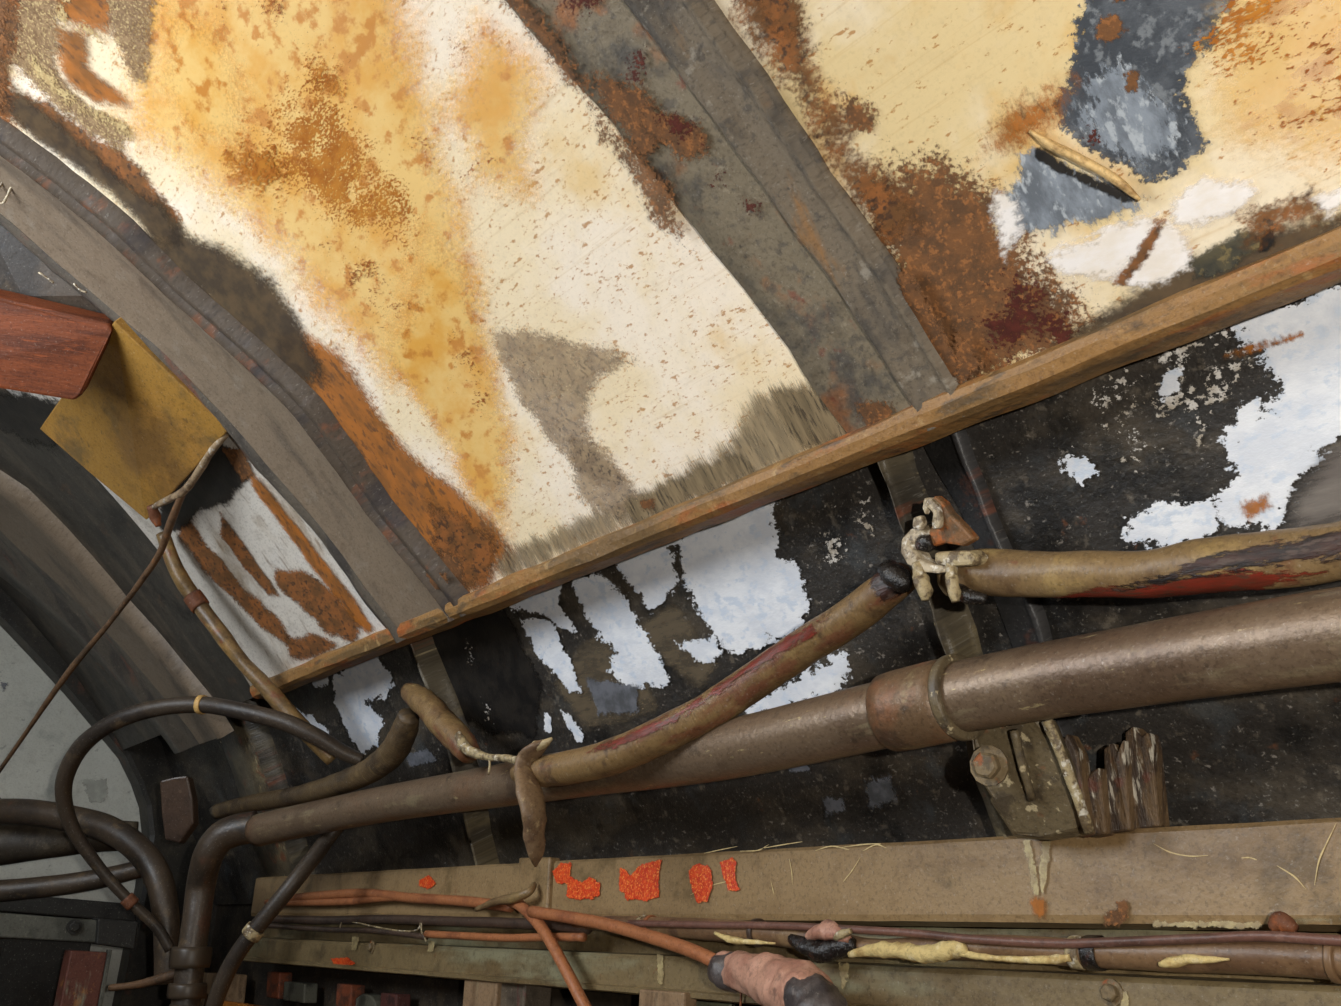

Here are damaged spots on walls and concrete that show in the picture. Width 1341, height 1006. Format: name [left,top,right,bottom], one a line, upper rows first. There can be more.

peeling [8,0,163,157]
corrosion [0,0,182,223]
corrosion [44,0,733,593]
corrosion [730,0,1101,384]
peeling [989,0,1256,287]
corrosion [178,475,373,661]
leakage [492,326,754,524]
peeling [509,498,811,716]
peeling [745,649,853,714]
corrosion [854,398,895,428]
peeling [1057,446,1100,487]
peeling [1090,285,1341,550]